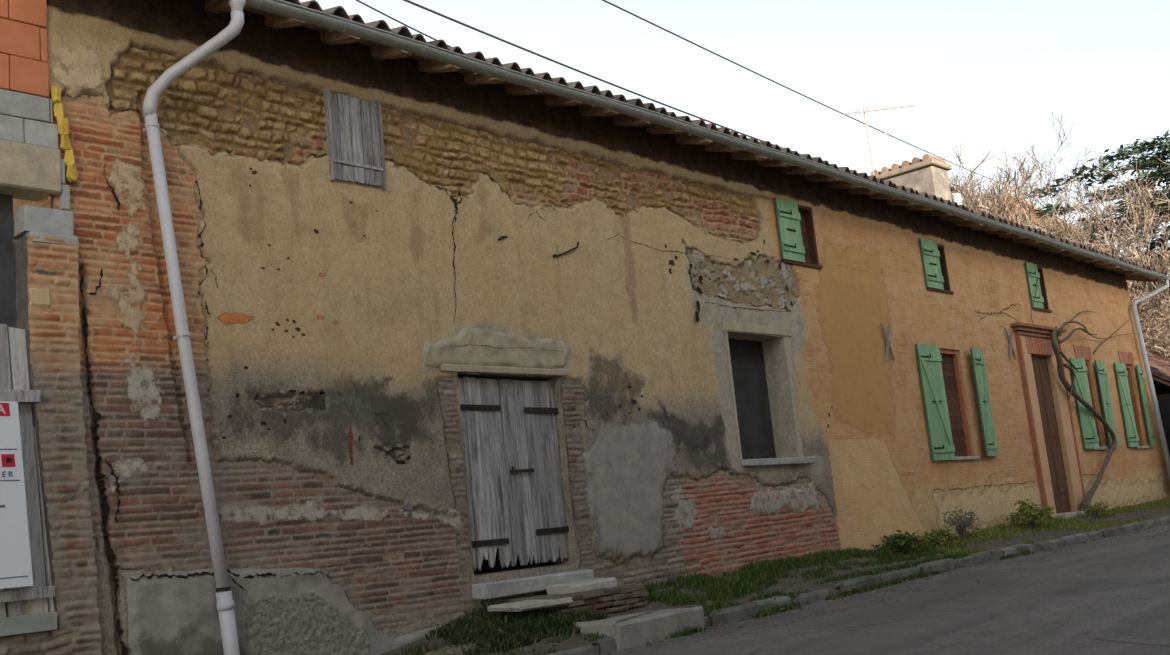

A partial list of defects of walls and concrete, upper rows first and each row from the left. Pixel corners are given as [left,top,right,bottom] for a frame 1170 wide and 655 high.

flaking render [50,46,477,655]
crack [443,190,560,352]
flaking render [381,107,782,270]
spalling [695,262,714,322]
crack [80,266,326,655]
flaking render [560,379,841,585]